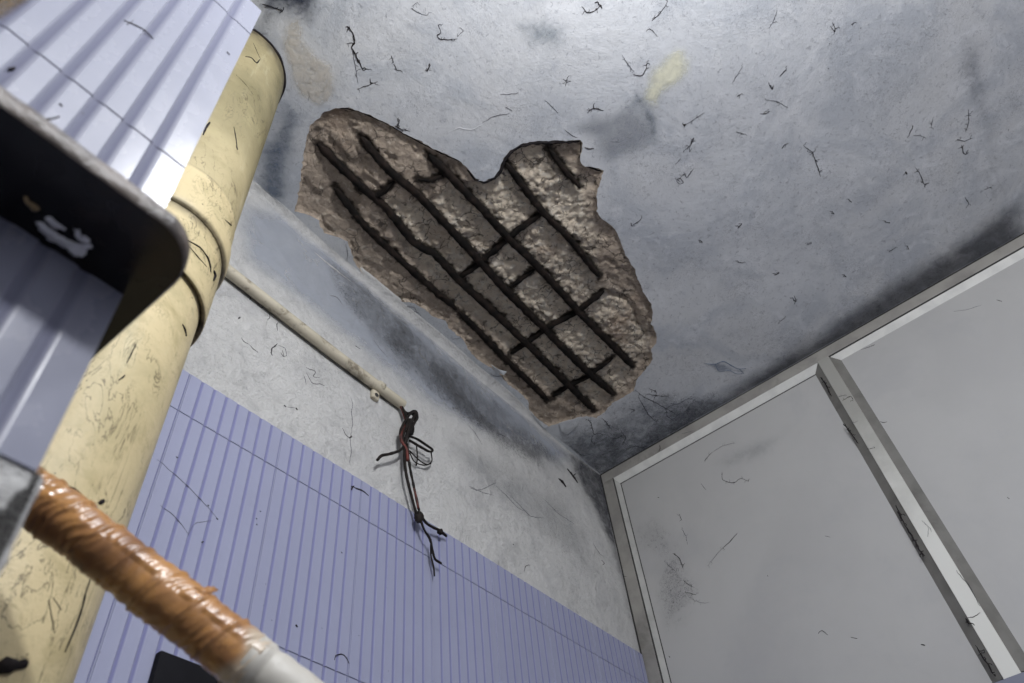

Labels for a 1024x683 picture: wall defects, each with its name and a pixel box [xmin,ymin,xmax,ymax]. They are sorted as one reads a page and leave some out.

spalling [295,107,657,434]
damp [570,392,721,543]